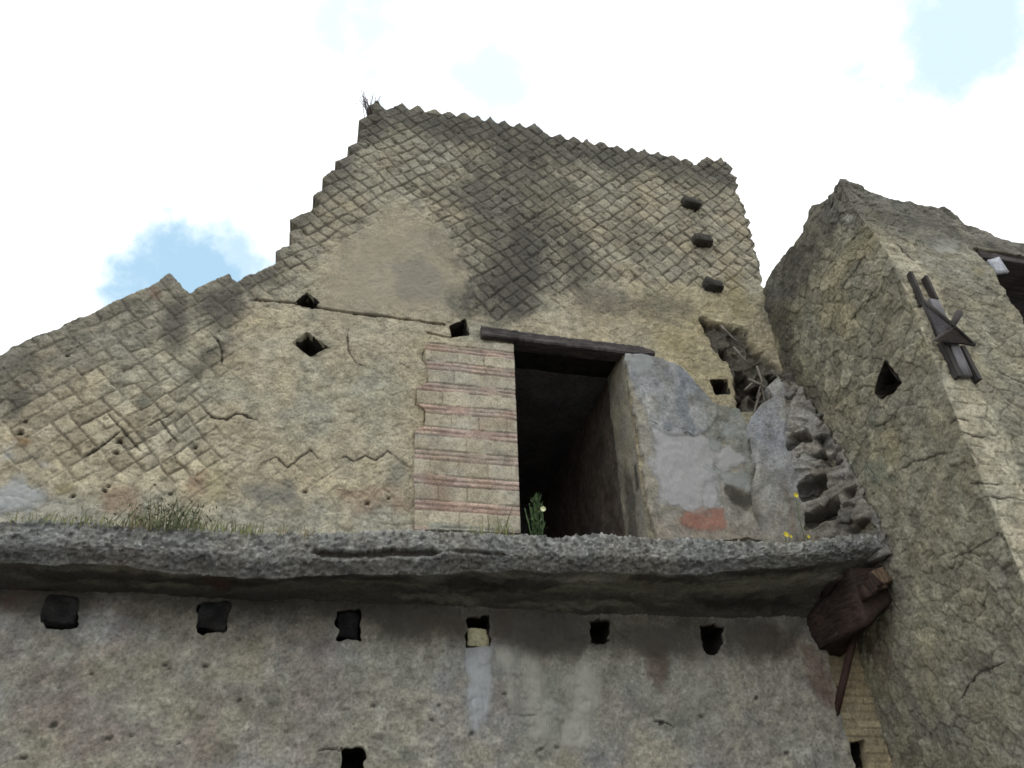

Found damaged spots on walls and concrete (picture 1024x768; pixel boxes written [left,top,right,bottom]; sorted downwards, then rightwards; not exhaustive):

crack [207,413,251,421]
crack [267,450,392,468]
peeling [622,353,771,542]
water stain [0,562,830,748]
crack [961,663,1003,699]